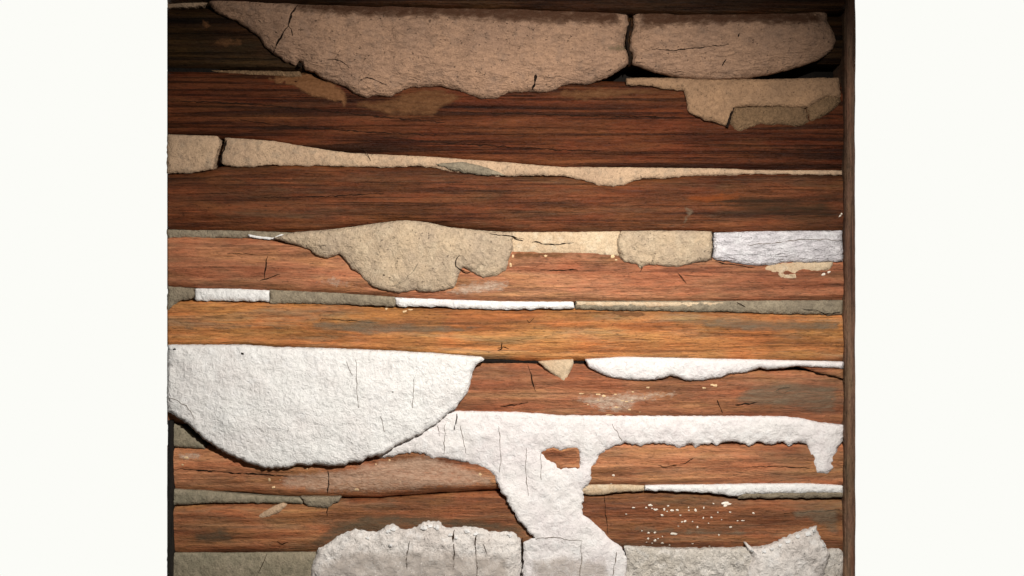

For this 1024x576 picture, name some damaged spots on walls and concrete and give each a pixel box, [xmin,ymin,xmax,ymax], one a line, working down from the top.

crack [273,5,298,53]
peeling [209,1,841,131]
crack [626,18,740,66]
peeling [274,220,514,293]
peeling [611,230,843,278]
crack [437,415,466,453]
peeling [167,344,844,576]
crack [498,367,542,496]